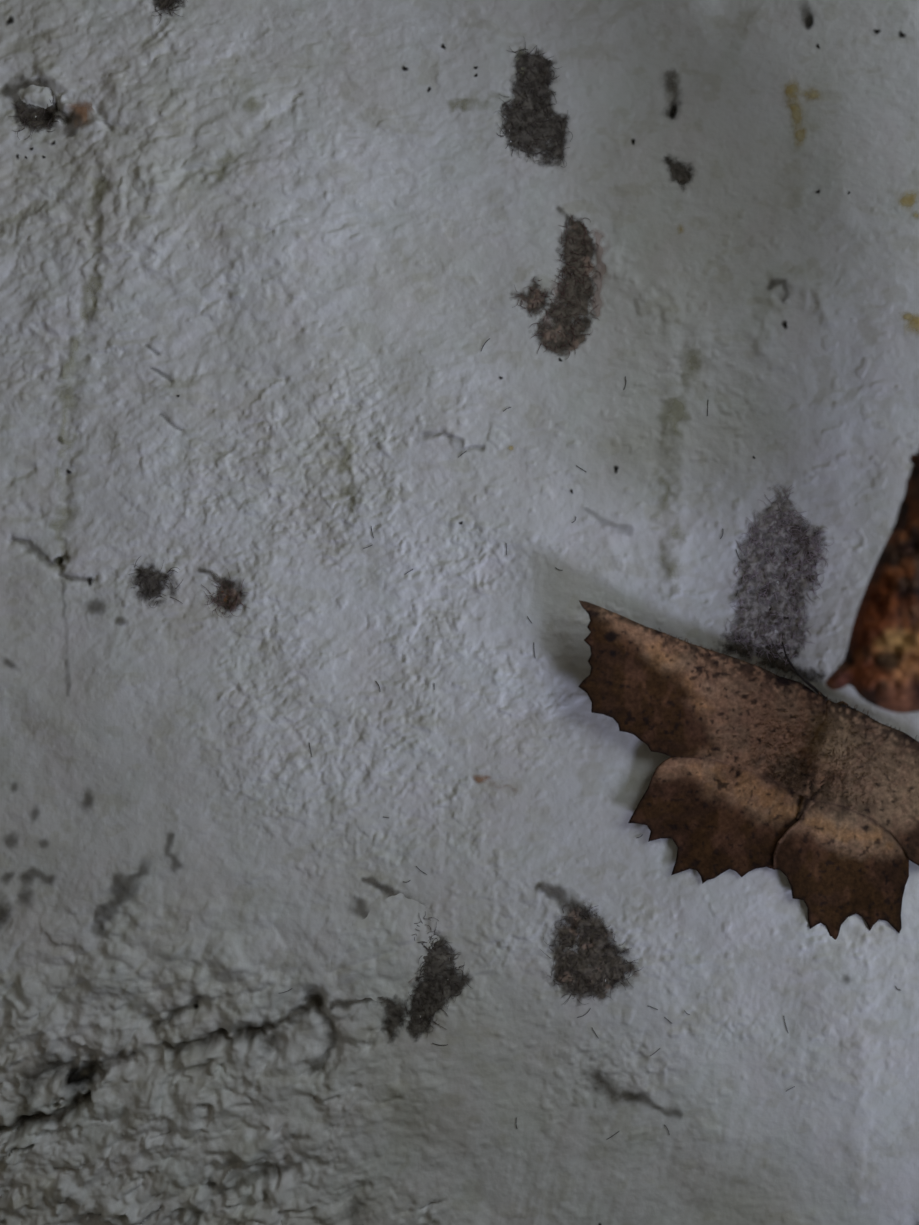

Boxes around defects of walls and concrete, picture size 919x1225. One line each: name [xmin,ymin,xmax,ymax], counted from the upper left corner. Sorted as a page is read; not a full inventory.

crack [248,995,322,1037]
crack [0,1092,91,1131]